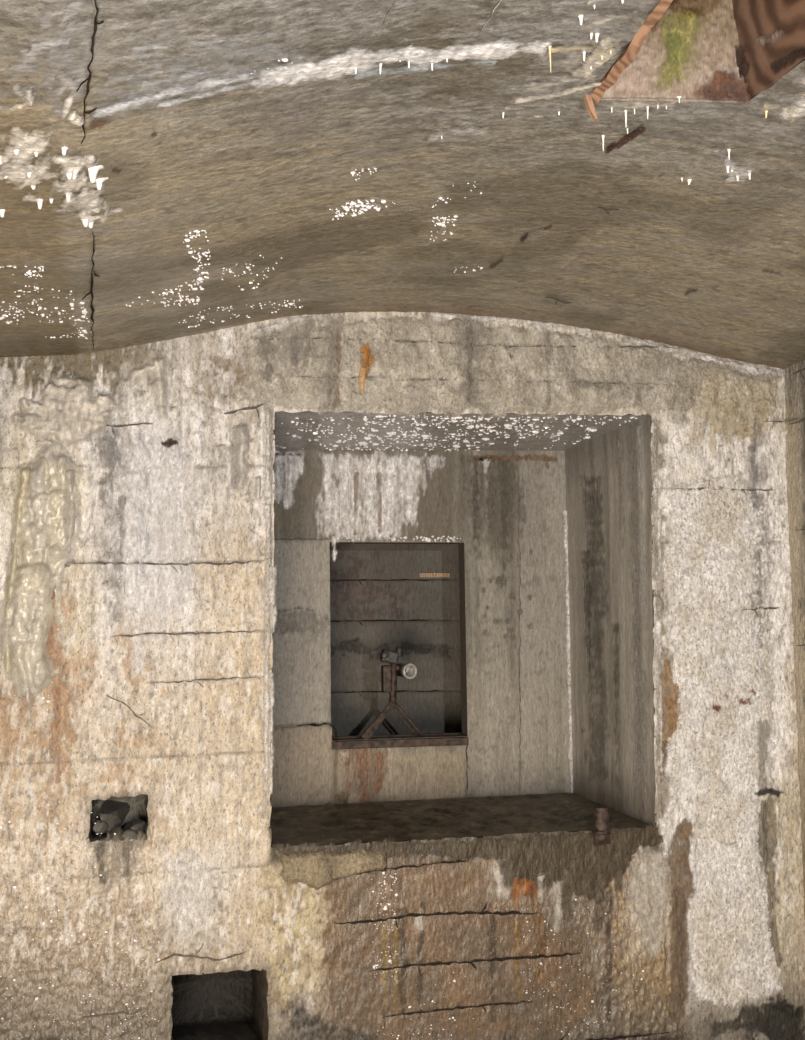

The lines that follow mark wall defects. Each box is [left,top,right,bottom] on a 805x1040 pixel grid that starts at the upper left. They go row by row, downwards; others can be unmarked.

crack [76,0,104,144]
crack [82,232,99,347]
corrosion [359,344,373,395]
leakage [245,315,805,1040]
crack [335,904,540,928]
corrosion [511,877,546,960]
crack [369,953,580,975]
crack [382,1001,528,1018]